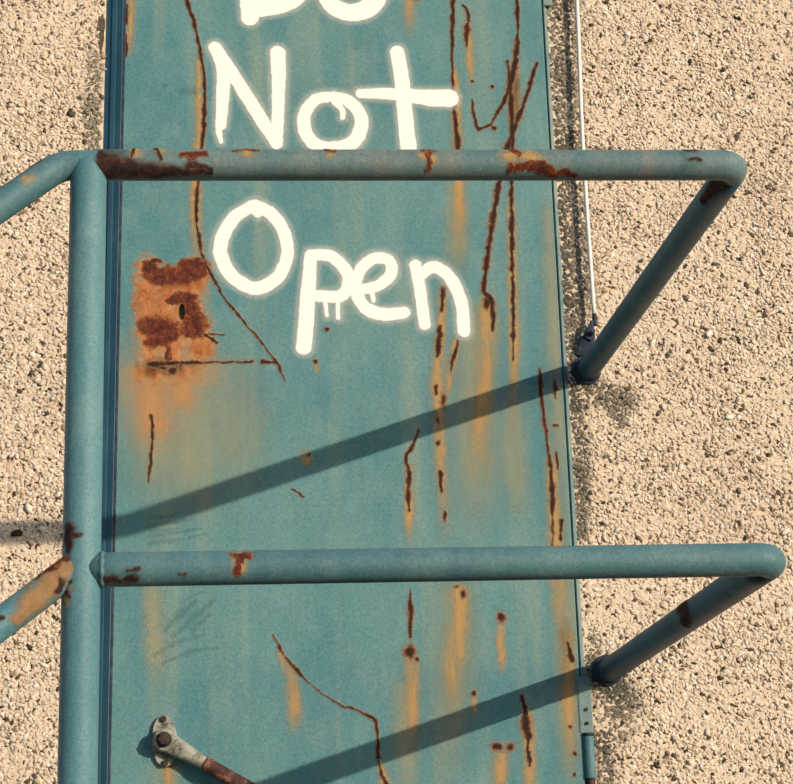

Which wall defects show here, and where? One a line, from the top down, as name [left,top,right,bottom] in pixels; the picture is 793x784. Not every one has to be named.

corrosion [94,148,214,179]
corrosion [504,149,578,178]
corrosion [699,181,725,206]
corrosion [131,257,276,443]
corrosion [431,285,459,500]
corrosion [496,612,506,665]
corrosion [676,600,690,628]
corrosion [491,694,535,784]